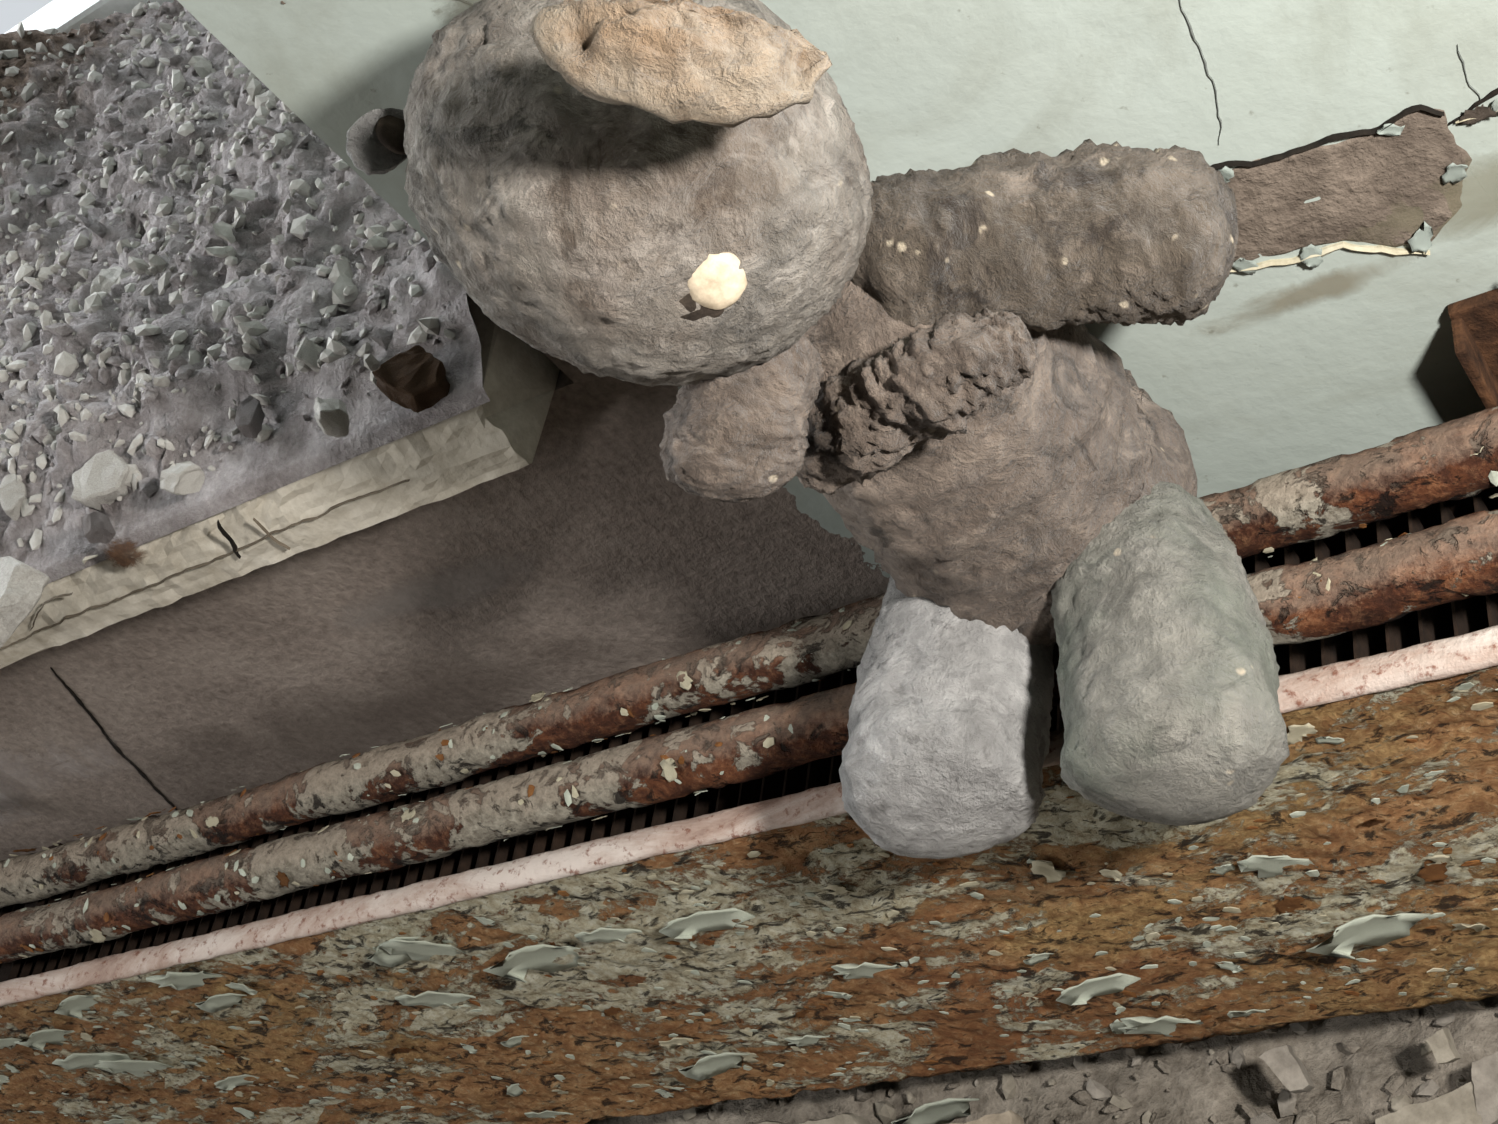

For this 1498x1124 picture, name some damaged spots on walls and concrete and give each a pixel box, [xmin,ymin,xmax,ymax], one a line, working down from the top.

crack [1179,0,1222,137]
crack [1448,44,1498,125]
spalling [1211,104,1472,274]